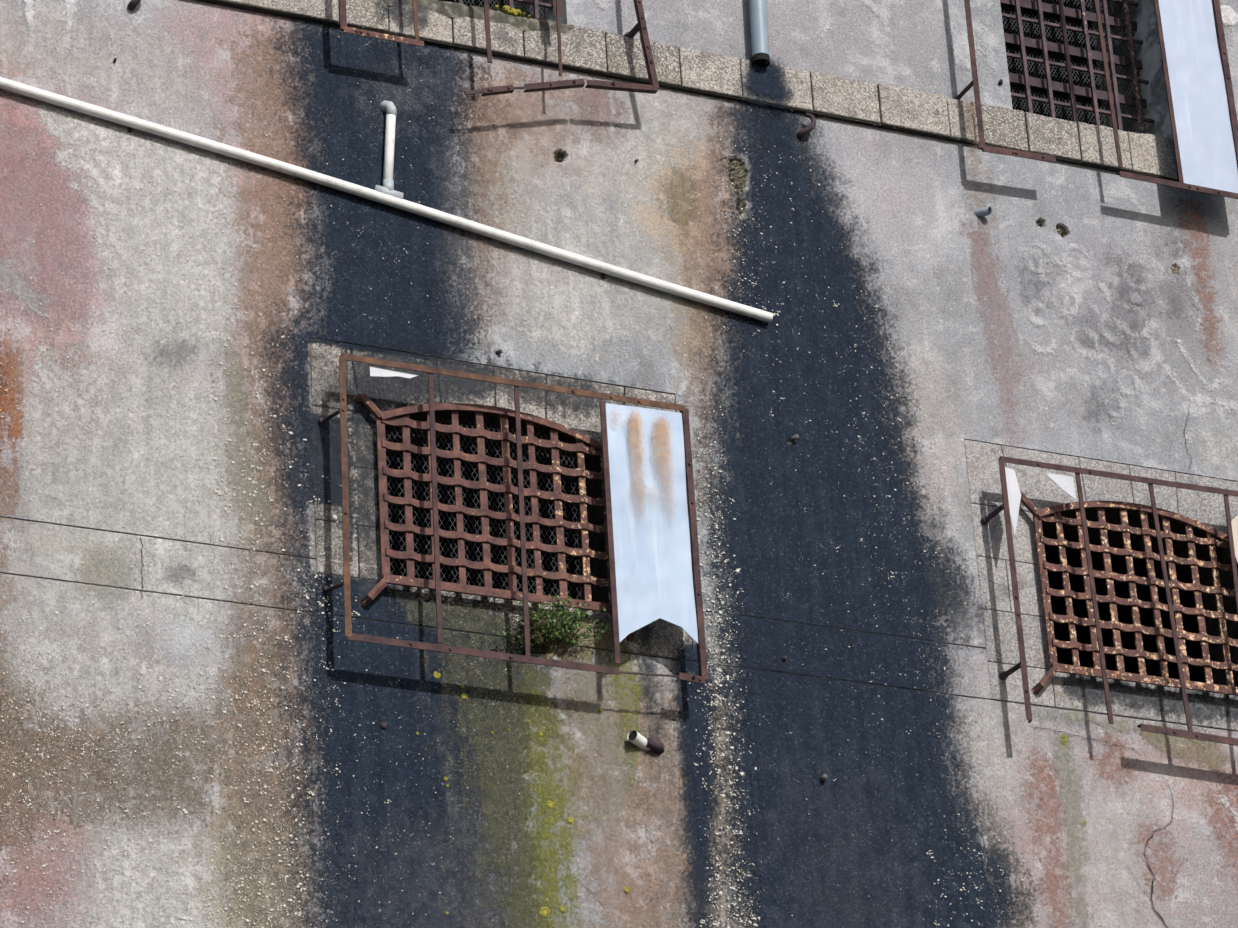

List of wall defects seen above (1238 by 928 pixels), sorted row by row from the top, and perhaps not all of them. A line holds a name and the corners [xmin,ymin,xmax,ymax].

crack [1220,5,1238,26]
leakage [215,0,602,928]
leakage [602,55,1031,928]
crack [1131,785,1174,928]